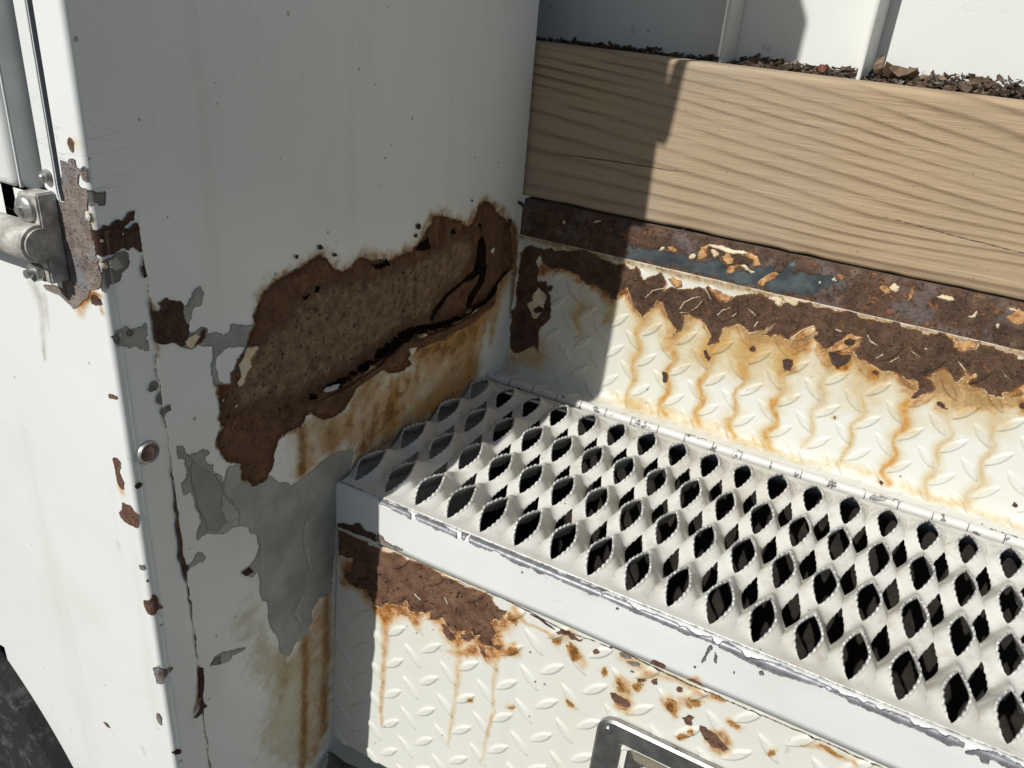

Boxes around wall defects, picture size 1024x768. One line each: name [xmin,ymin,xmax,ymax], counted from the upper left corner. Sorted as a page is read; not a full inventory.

peeling [87,190,106,206]
peeling [95,251,130,292]
peeling [111,323,150,351]
peeling [183,323,254,384]
corrosion [214,197,1024,487]
crack [142,255,211,768]
peeling [177,446,402,657]
corrosion [337,529,518,713]
corrosion [552,638,581,662]
corrosion [601,667,643,693]
corrosion [663,698,701,716]